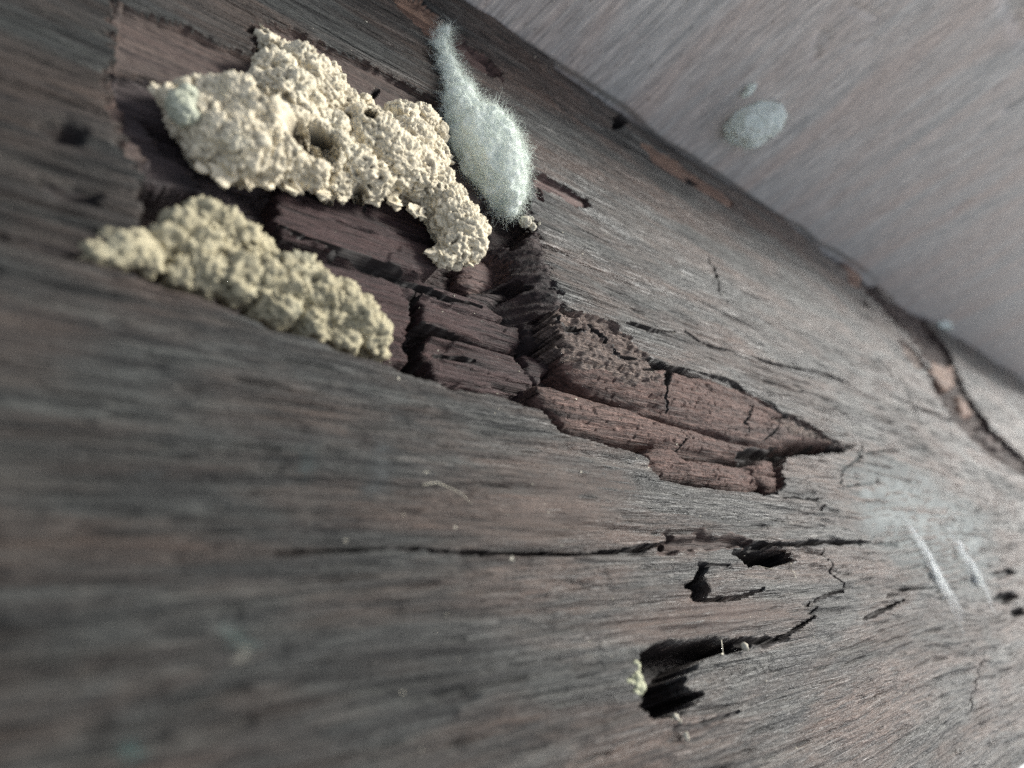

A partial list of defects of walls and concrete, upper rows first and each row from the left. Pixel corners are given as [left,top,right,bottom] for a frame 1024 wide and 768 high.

spalling [99,0,854,496]
crack [274,525,899,603]